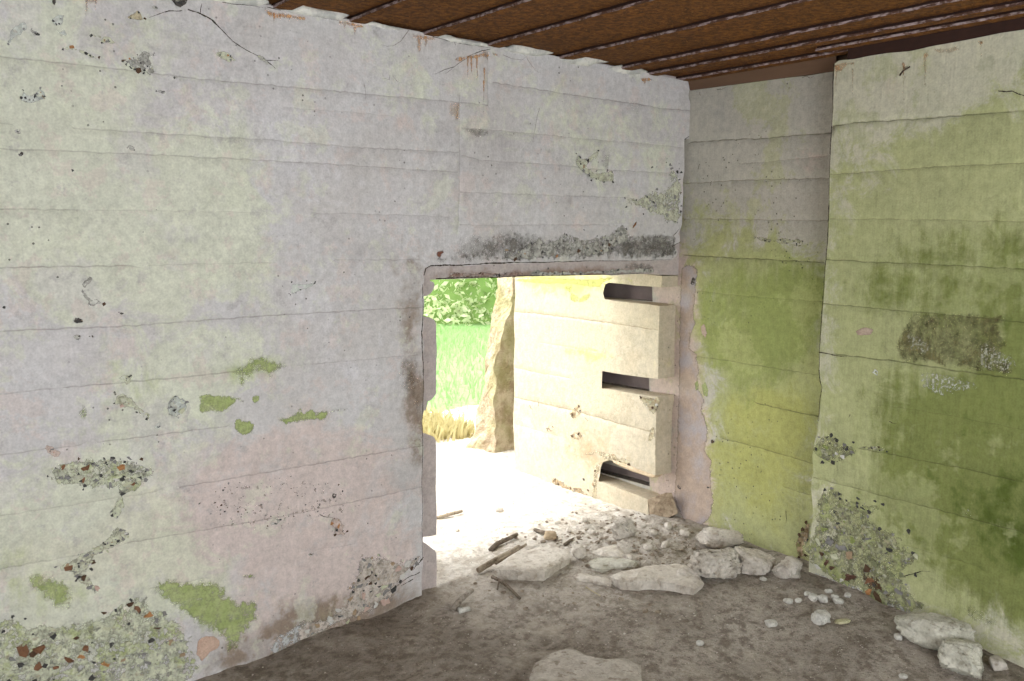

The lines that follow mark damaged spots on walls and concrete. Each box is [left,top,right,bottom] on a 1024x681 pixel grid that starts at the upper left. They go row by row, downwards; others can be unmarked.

crack [149,2,280,68]
spalling [624,163,683,223]
water stain [463,233,533,260]
water stain [554,235,676,269]
water stain [899,315,1012,372]